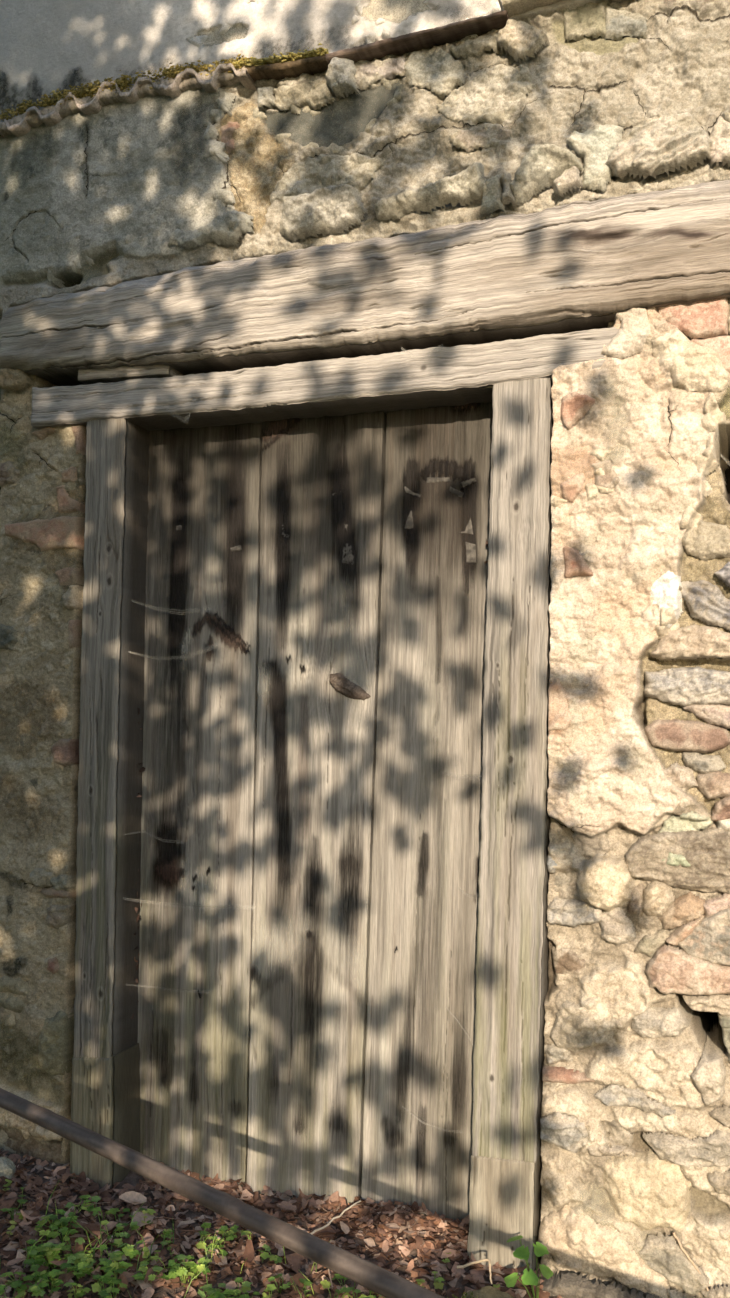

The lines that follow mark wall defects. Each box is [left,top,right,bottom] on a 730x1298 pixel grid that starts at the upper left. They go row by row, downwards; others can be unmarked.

peeling [186,22,248,48]
peeling [351,0,434,63]
crack [588,5,730,51]
water stain [0,73,43,118]
spalling [204,78,405,234]